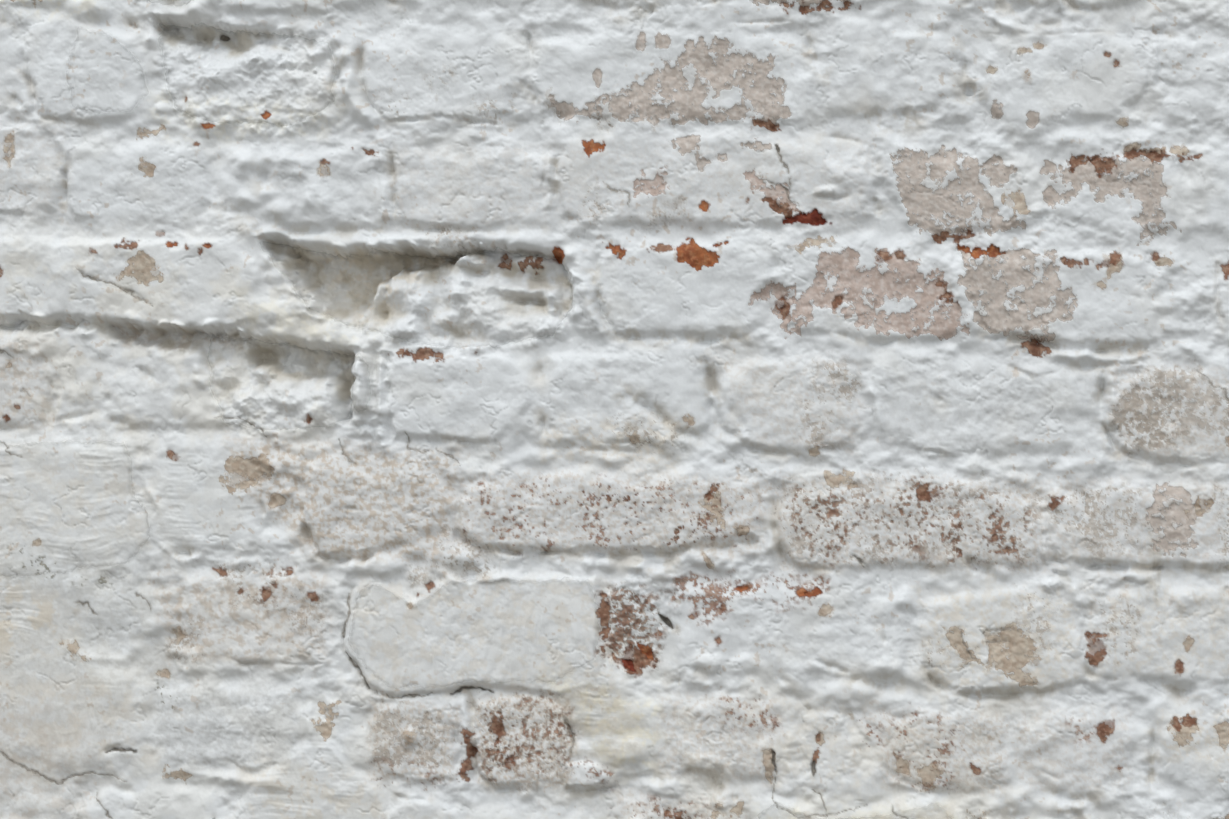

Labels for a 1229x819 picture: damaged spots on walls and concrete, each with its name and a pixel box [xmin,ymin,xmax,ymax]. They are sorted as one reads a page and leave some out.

peeling [1017,42,1044,54]
peeling [550,32,791,172]
peeling [991,100,1003,119]
peeling [1026,111,1039,128]
peeling [1040,142,1202,246]
spalling [647,238,728,271]
peeling [743,145,1122,357]
peeling [1114,369,1229,447]
peeling [1049,483,1214,557]
spalling [596,589,673,675]